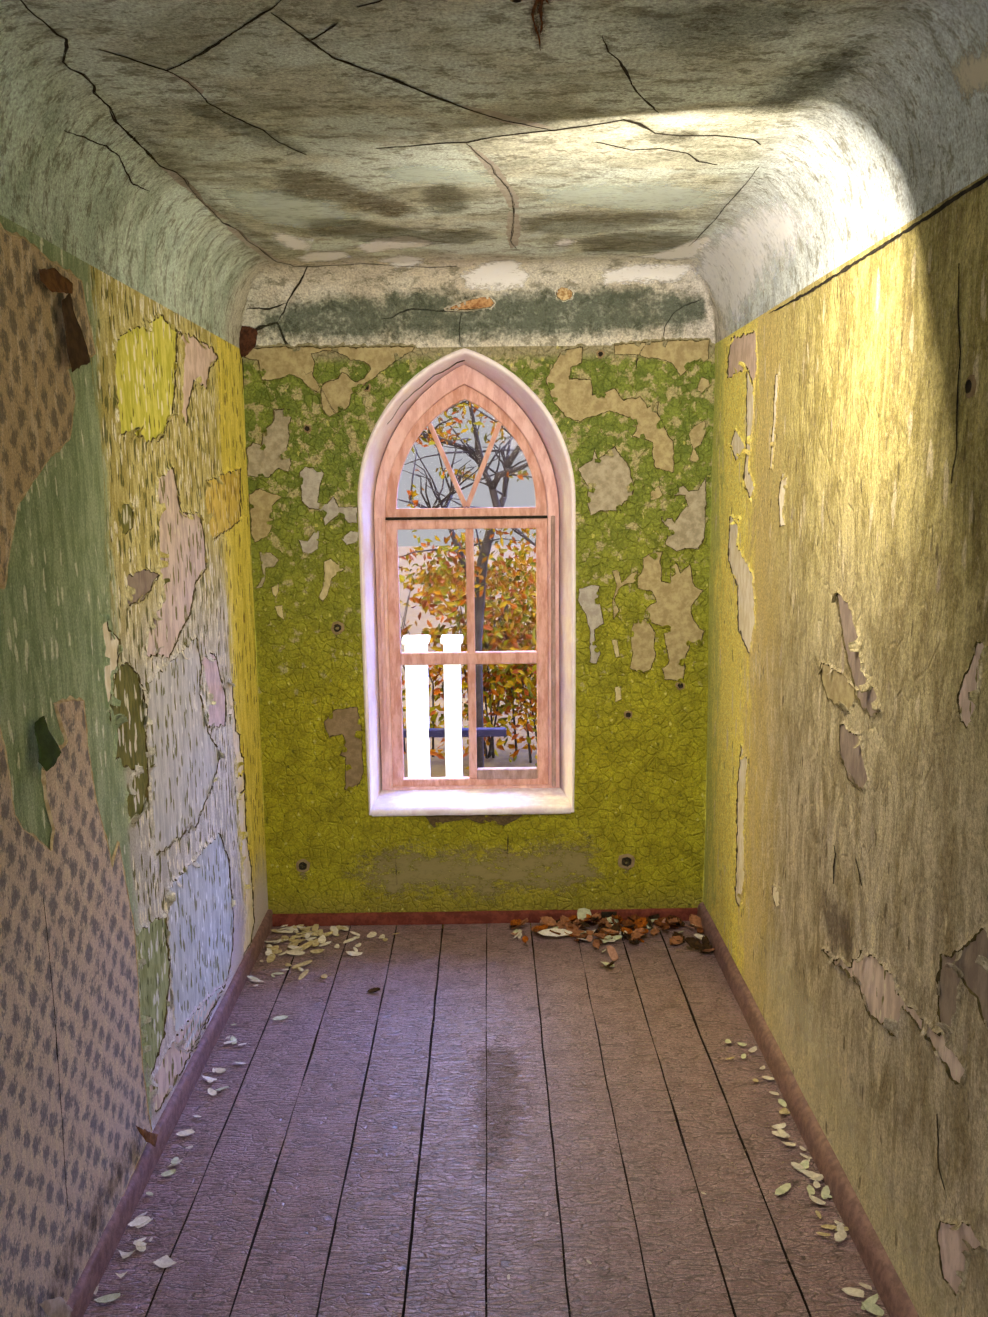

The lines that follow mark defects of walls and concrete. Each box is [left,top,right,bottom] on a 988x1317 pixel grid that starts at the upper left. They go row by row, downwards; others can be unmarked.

corrosion [531,0,549,50]
leakage [272,170,490,243]
crack [20,0,761,424]
leakage [261,286,706,342]
crack [769,176,988,314]
crack [951,264,961,483]
peeling [542,343,709,684]
peeling [612,327,759,656]
peeling [818,588,884,794]
spalling [424,814,524,829]
peeling [819,923,988,1092]
peeling [753,1066,849,1242]